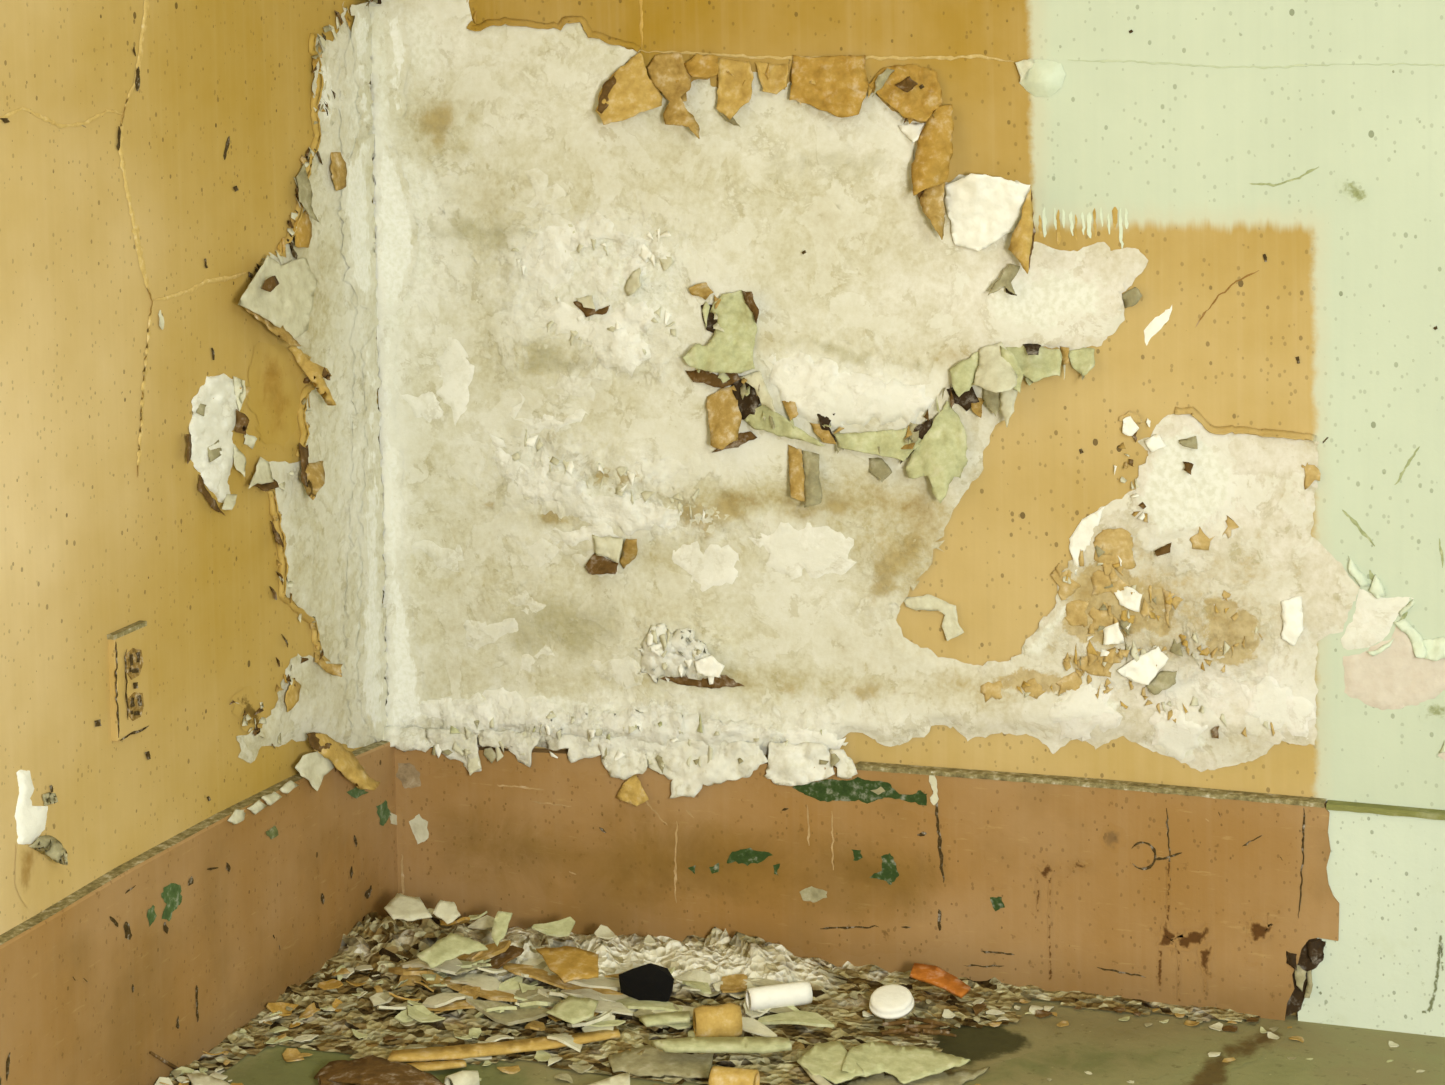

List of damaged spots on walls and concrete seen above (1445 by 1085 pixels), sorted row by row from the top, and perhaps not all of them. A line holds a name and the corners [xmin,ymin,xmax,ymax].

crack [0,0,246,475]
peeling [186,0,1445,844]
peeling [15,770,68,908]
spalling [1286,938,1326,1016]